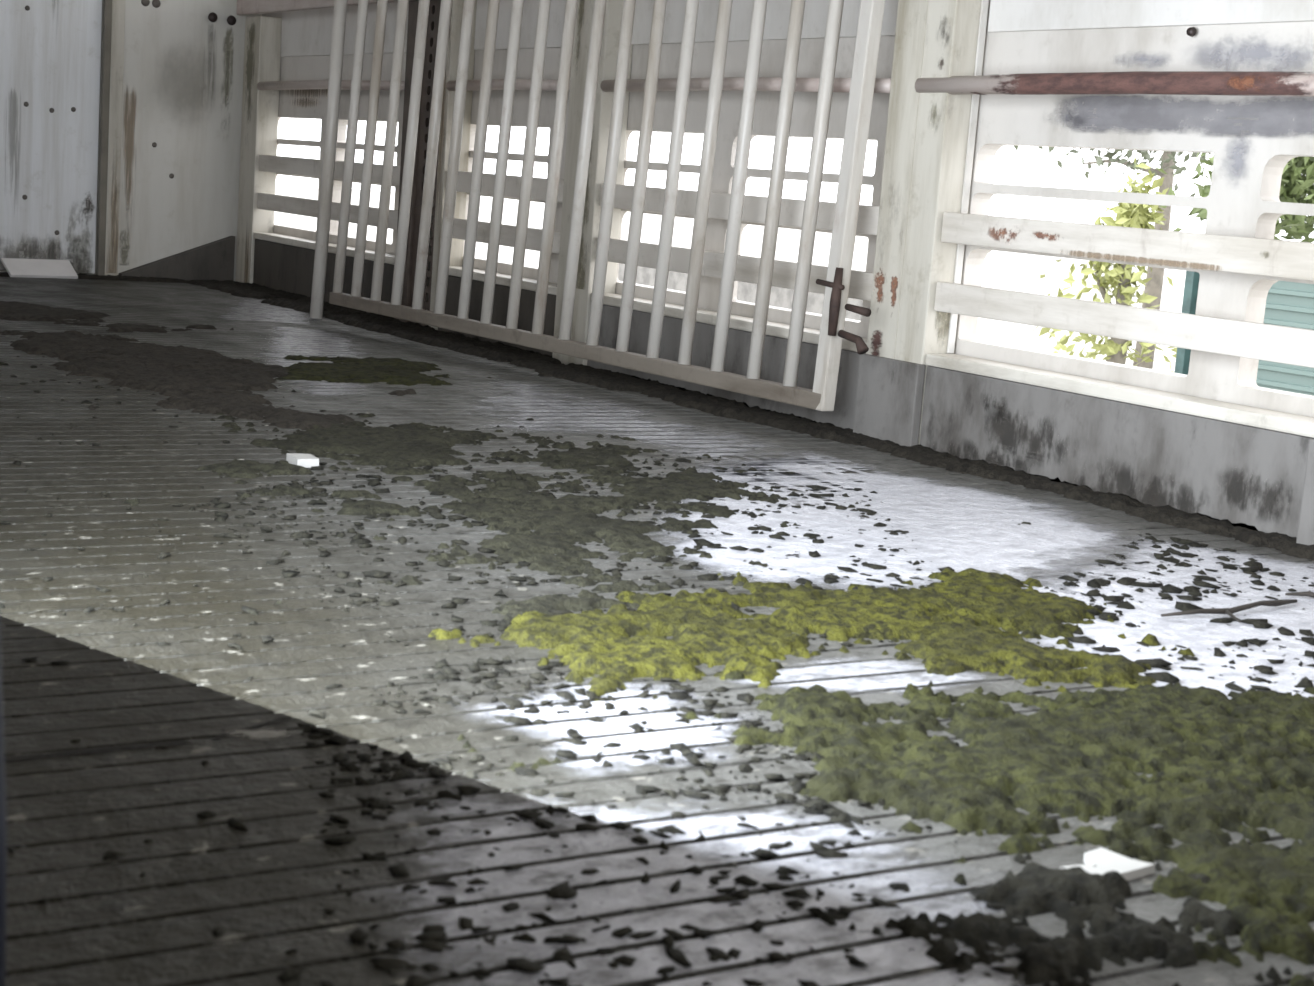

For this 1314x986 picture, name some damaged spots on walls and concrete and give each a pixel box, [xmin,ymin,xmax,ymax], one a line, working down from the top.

corrosion [971,71,1309,96]
corrosion [875,272,898,308]
corrosion [871,330,882,356]